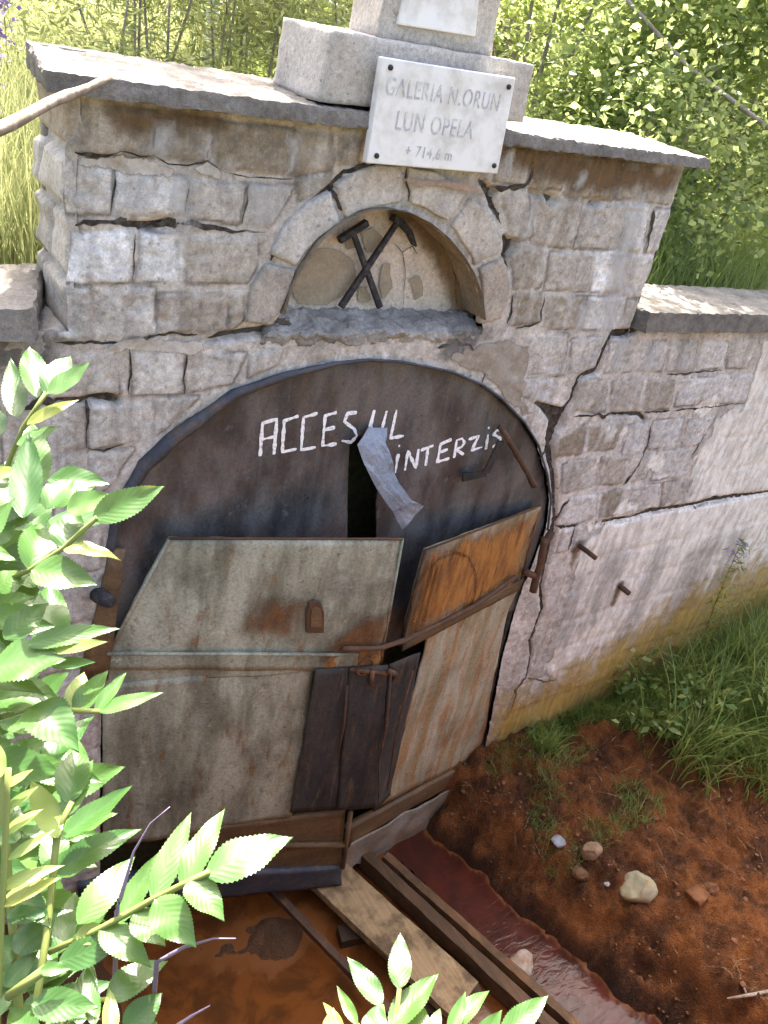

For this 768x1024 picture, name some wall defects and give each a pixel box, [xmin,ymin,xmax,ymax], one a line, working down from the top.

crack [75,124,291,280]
crack [320,163,375,211]
crack [479,162,534,267]
crack [645,211,655,252]
crack [507,296,545,328]
crack [437,343,474,351]
crack [512,328,768,706]
rust [411,516,535,633]
rust [247,602,299,631]
rust [325,618,385,668]
rust [492,564,768,743]